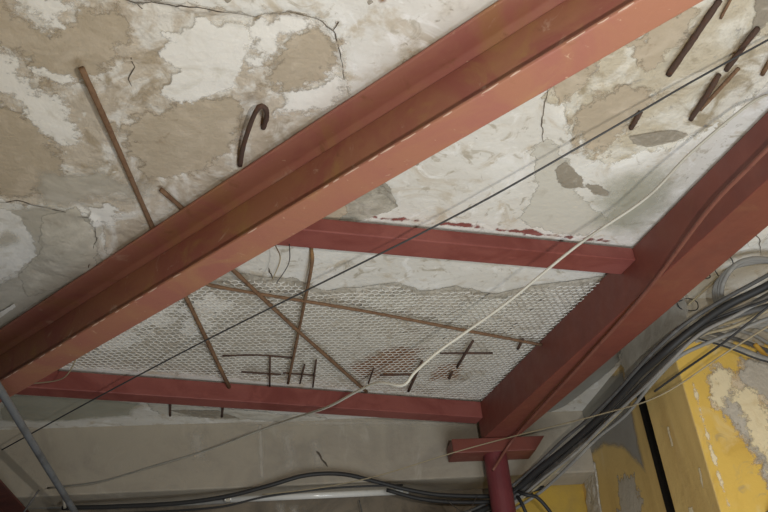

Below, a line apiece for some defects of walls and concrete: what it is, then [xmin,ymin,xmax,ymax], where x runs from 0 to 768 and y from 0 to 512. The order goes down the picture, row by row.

crack [127,0,349,94]
spalling [0,0,351,280]
spalling [518,0,768,236]
peeling [748,226,768,247]
spalling [693,356,768,506]
spalling [584,462,602,512]
peeling [616,473,644,512]